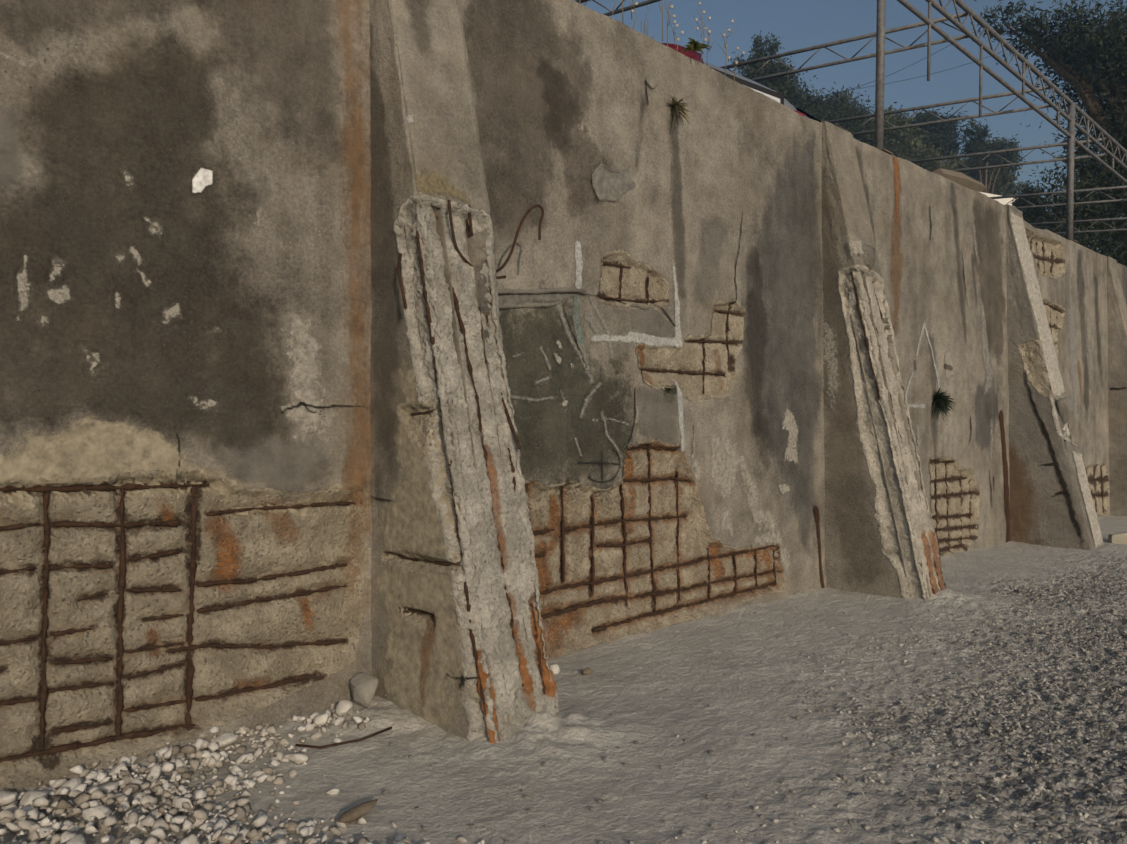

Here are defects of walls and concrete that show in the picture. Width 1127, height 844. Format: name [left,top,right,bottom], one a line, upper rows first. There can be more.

water stain [17,255,30,319]
peeling [192,168,212,193]
rust [891,156,902,332]
water stain [283,317,331,447]
spalling [0,192,790,791]
spalling [823,240,980,600]
crack [1024,372,1084,542]
peeling [1010,212,1110,547]